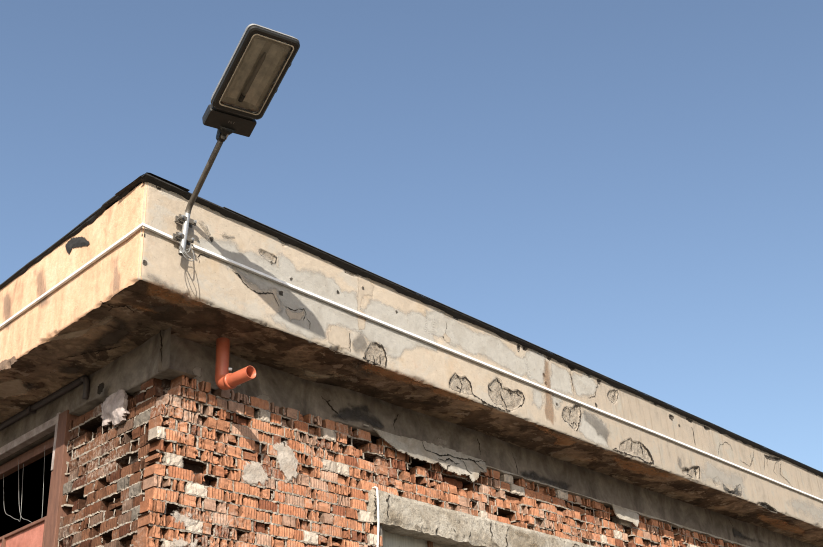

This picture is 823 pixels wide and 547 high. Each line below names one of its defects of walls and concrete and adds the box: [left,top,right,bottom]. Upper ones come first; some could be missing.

crack [232,270,310,329]
peeling [198,233,654,464]
flaking render [363,424,751,547]